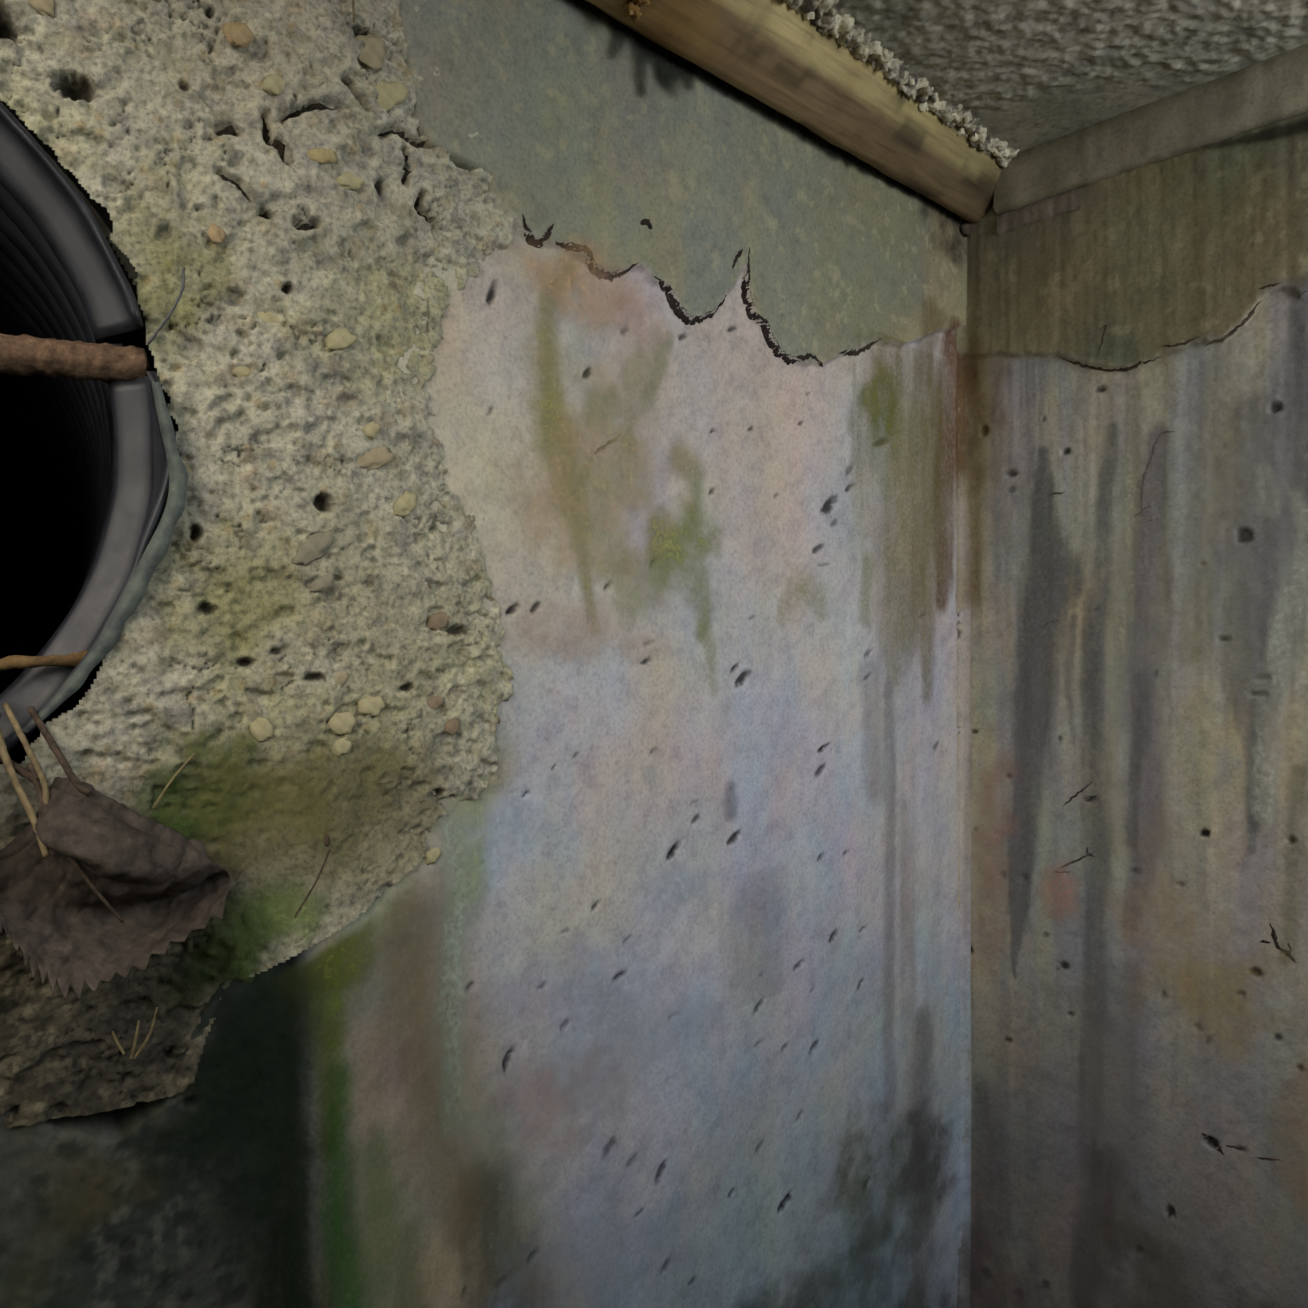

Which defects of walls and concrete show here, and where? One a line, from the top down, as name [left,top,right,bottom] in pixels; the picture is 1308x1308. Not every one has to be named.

spalling [0,0,538,1129]
water stain [307,930,375,1308]
water stain [438,802,481,1135]
water stain [980,390,1166,979]
water stain [1213,283,1308,853]